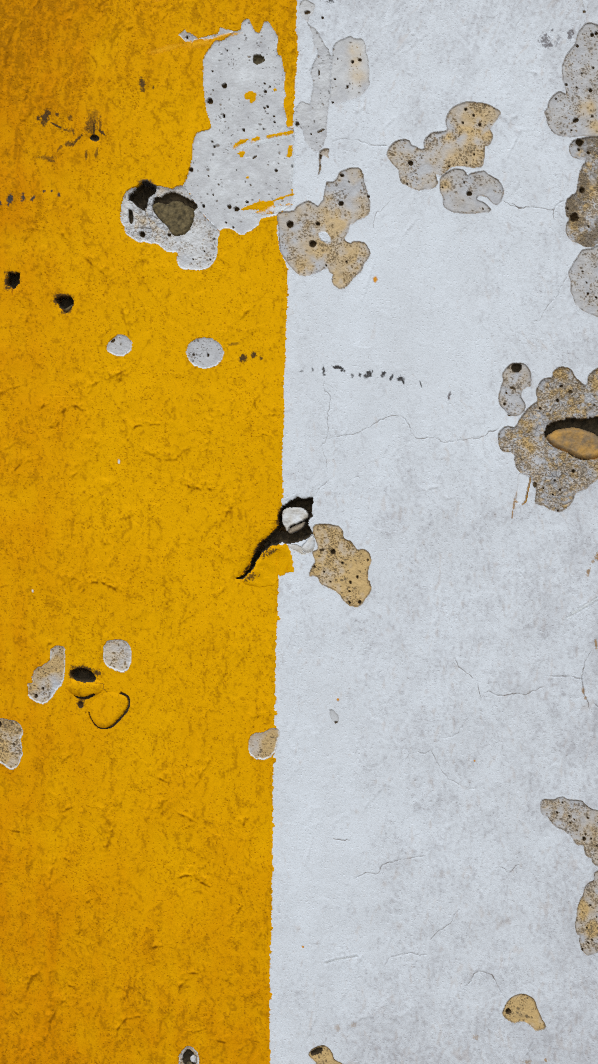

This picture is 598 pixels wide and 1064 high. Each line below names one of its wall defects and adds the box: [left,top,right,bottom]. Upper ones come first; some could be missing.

peeling [120,0,371,289]
peeling [387,102,504,214]
peeling [544,0,598,317]
peeling [186,337,224,369]
spalling [498,363,598,513]
peeling [309,524,372,608]
peeling [27,645,66,704]
peeling [103,640,132,673]
peeling [0,718,23,770]
peeling [540,797,598,956]
peeling [308,1045,342,1064]
peeling [502,994,547,1031]